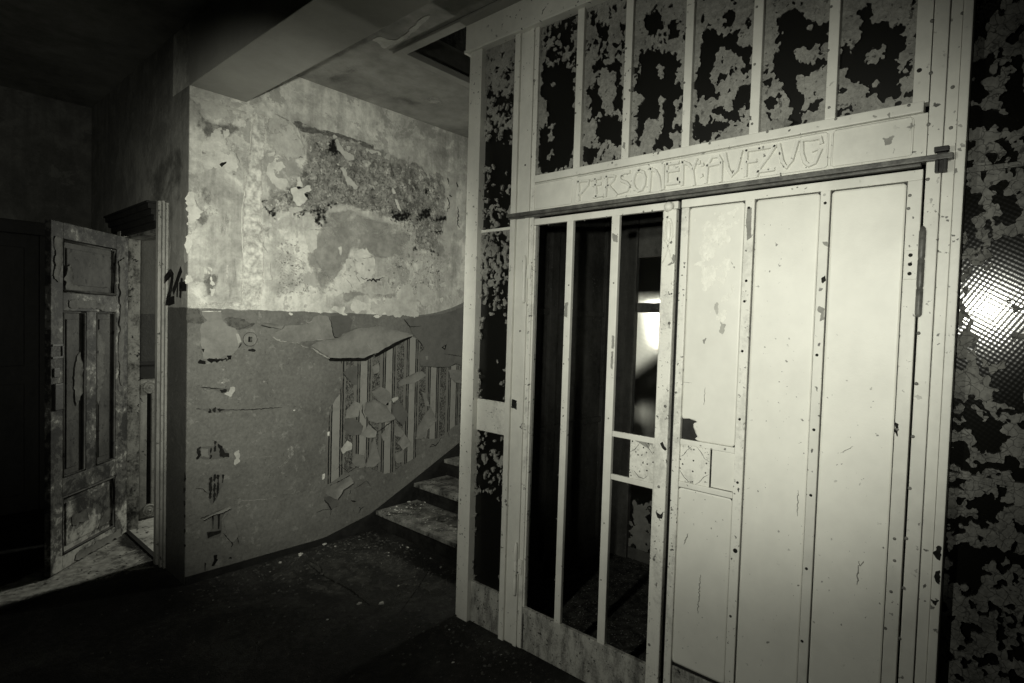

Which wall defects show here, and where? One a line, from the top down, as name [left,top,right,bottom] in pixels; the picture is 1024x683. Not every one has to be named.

peeling [484,38,516,145]
peeling [537,0,918,175]
peeling [266,116,311,213]
peeling [333,135,358,190]
peeling [295,230,317,252]
peeling [478,164,511,342]
peeling [448,369,462,384]
peeling [931,0,1024,683]
peeling [324,371,437,510]
peeling [474,431,504,502]